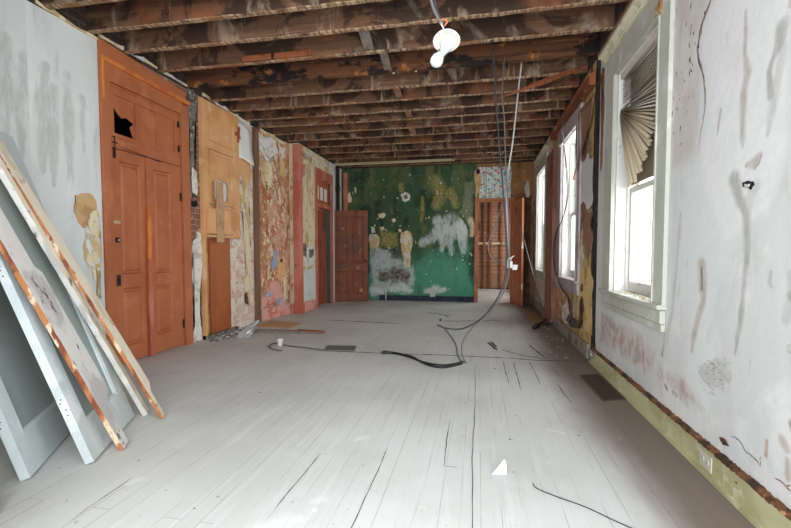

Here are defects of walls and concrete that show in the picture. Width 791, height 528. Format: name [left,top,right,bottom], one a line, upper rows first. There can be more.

flaking render [74,193,102,299]
flaking render [35,0,250,207]
flaking render [192,231,202,342]
peeling [232,158,251,309]
peeling [259,128,288,307]
peeling [368,212,416,270]
peeling [397,169,480,239]
damp [726,0,791,358]